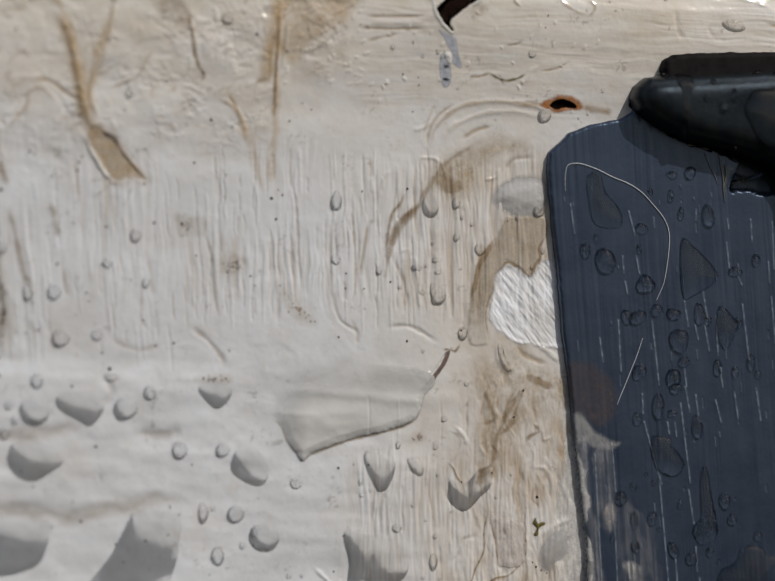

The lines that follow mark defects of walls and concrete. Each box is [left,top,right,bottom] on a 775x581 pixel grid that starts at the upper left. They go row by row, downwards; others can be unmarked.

corrosion [541,96,582,112]
peeling [88,126,143,179]
peeling [471,216,563,348]